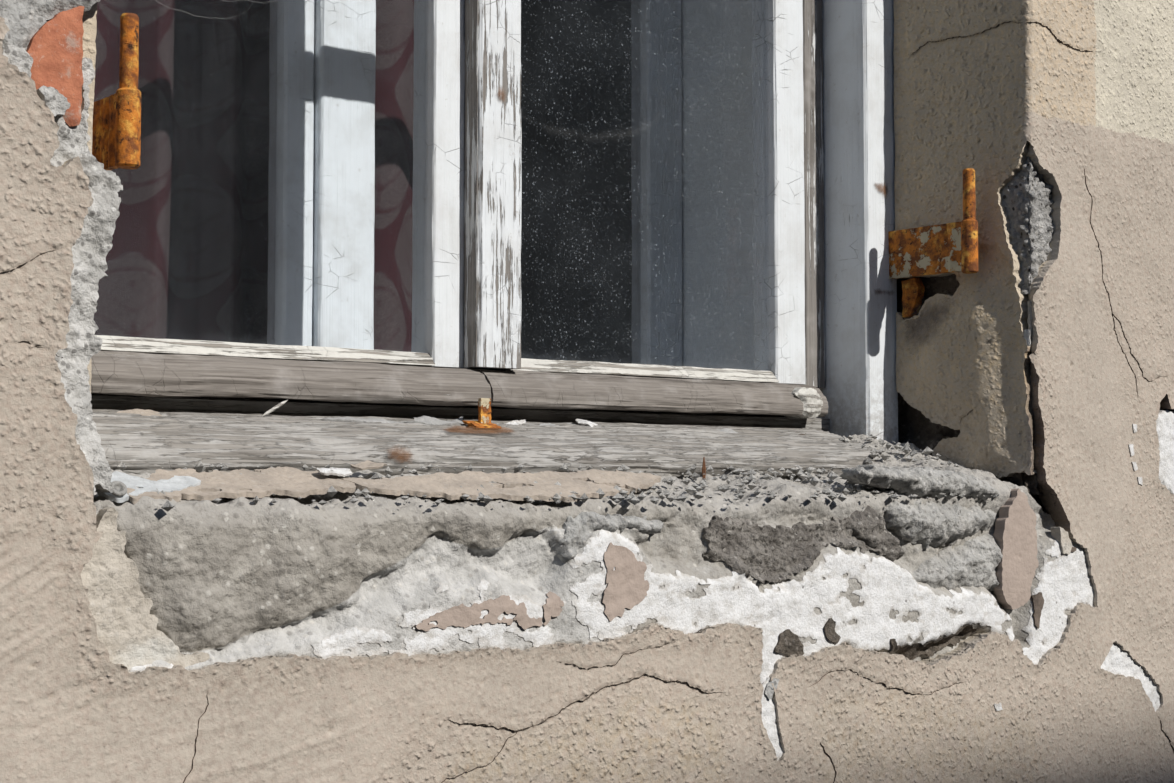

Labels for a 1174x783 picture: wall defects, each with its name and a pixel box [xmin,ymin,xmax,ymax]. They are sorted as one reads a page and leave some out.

crack [908,21,1088,55]
flaking render [1001,156,1055,346]
crack [1084,169,1166,394]
flaking render [0,0,661,673]
corrosion [444,426,513,434]
flaking render [898,392,960,456]
flaking render [1128,423,1143,485]
flaking render [1156,408,1174,494]
peeling [312,473,1094,760]
crack [441,627,723,783]
peeling [1101,642,1160,712]